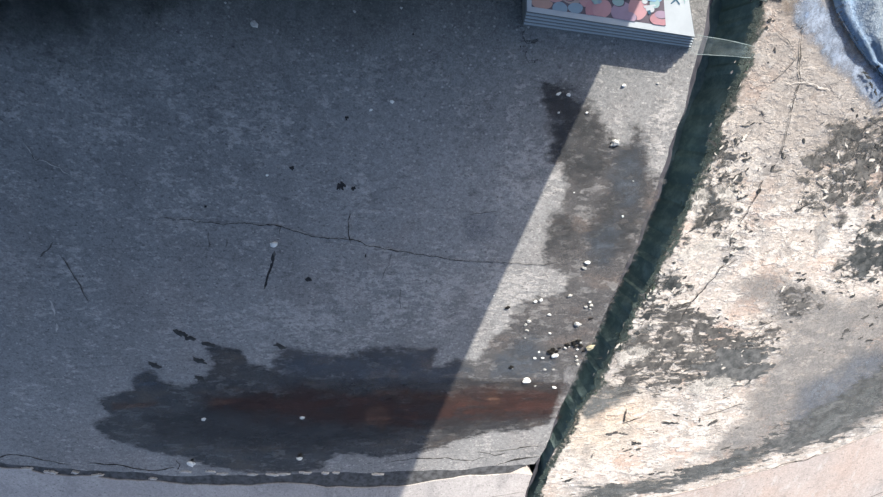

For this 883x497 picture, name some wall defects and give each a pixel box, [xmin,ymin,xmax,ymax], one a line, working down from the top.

peeling [692,168,749,212]
crack [149,216,581,278]
peeling [795,203,831,252]
damp [96,84,665,473]
crack [669,258,738,321]
peeling [615,346,654,366]
peeling [686,378,733,396]
crack [0,445,543,497]
crack [620,431,883,497]